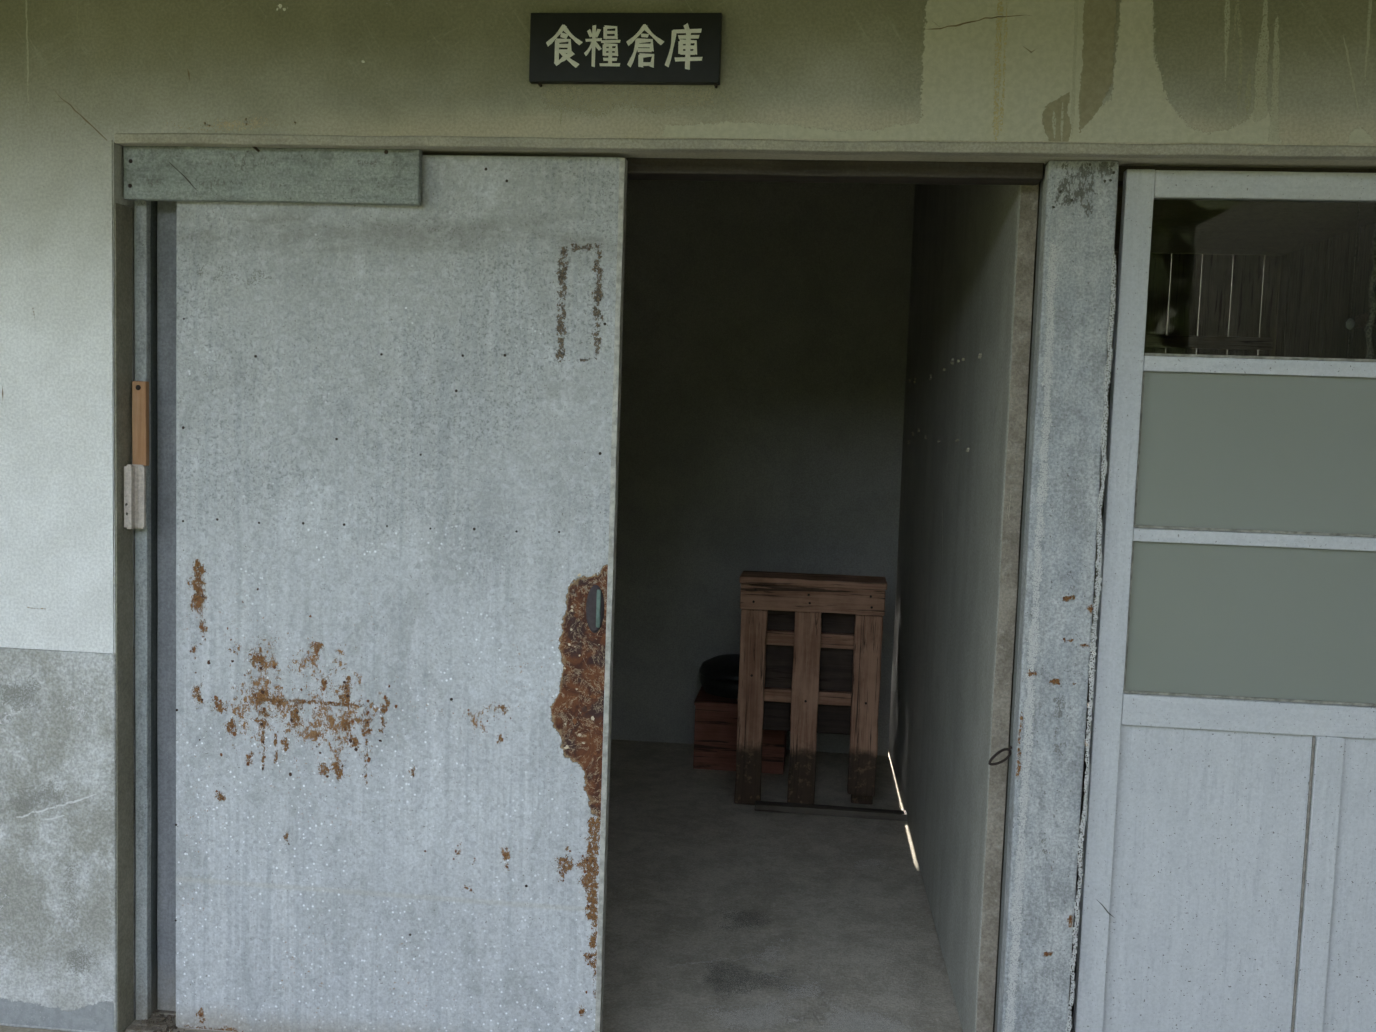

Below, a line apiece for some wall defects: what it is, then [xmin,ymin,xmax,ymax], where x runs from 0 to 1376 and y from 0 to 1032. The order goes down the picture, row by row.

crack [933,15,1034,55]
leakage [1042,0,1117,142]
efflorescence [1224,0,1280,142]
corrosion [187,559,398,784]
corrosion [550,564,608,1017]
corrosion [184,1007,244,1032]